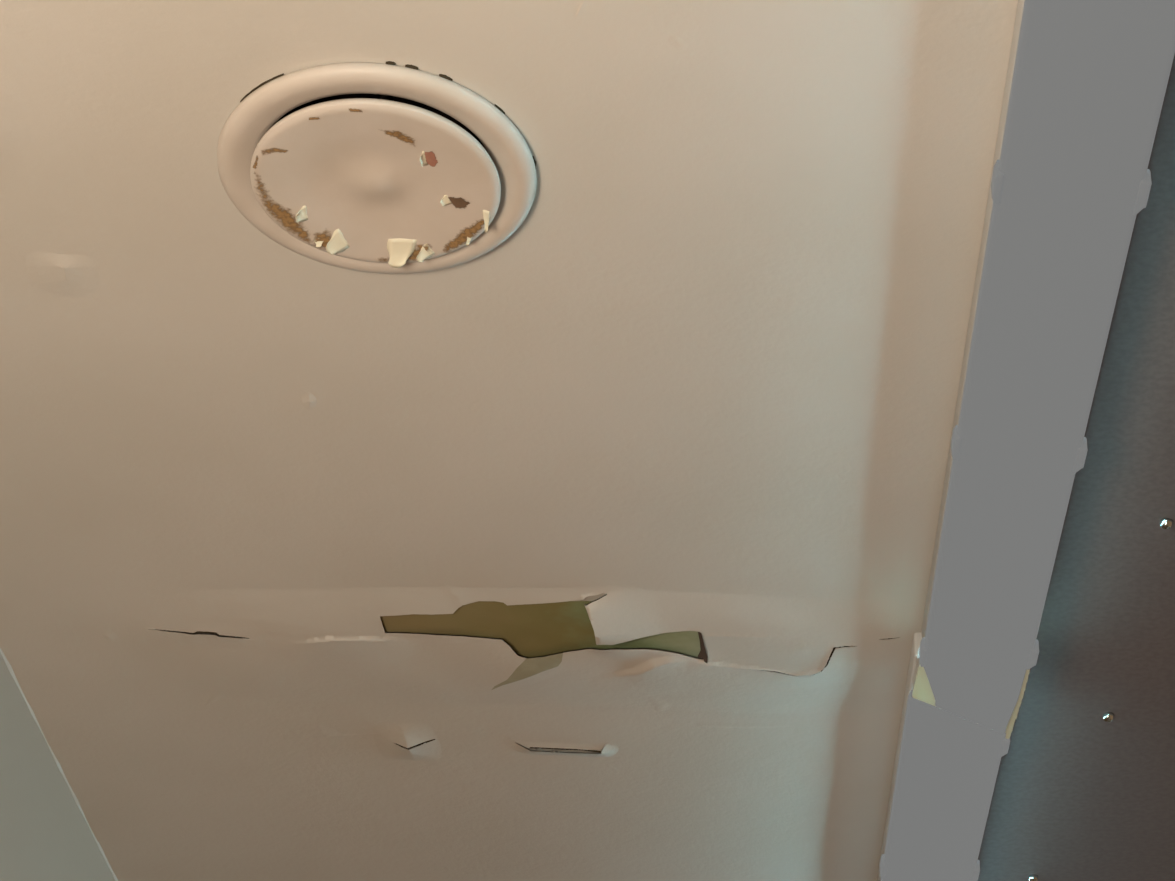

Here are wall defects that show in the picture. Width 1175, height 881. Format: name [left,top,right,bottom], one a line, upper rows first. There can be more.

corrosion [386,131,413,143]
peeling [419,151,438,167]
corrosion [253,148,331,247]
peeling [440,195,470,208]
peeling [314,229,350,255]
peeling [387,238,435,268]
corrosion [407,245,429,260]
corrosion [445,220,484,252]
peeling [466,210,489,246]
crack [154,629,245,638]
peeling [380,592,707,690]
crack [767,646,850,675]